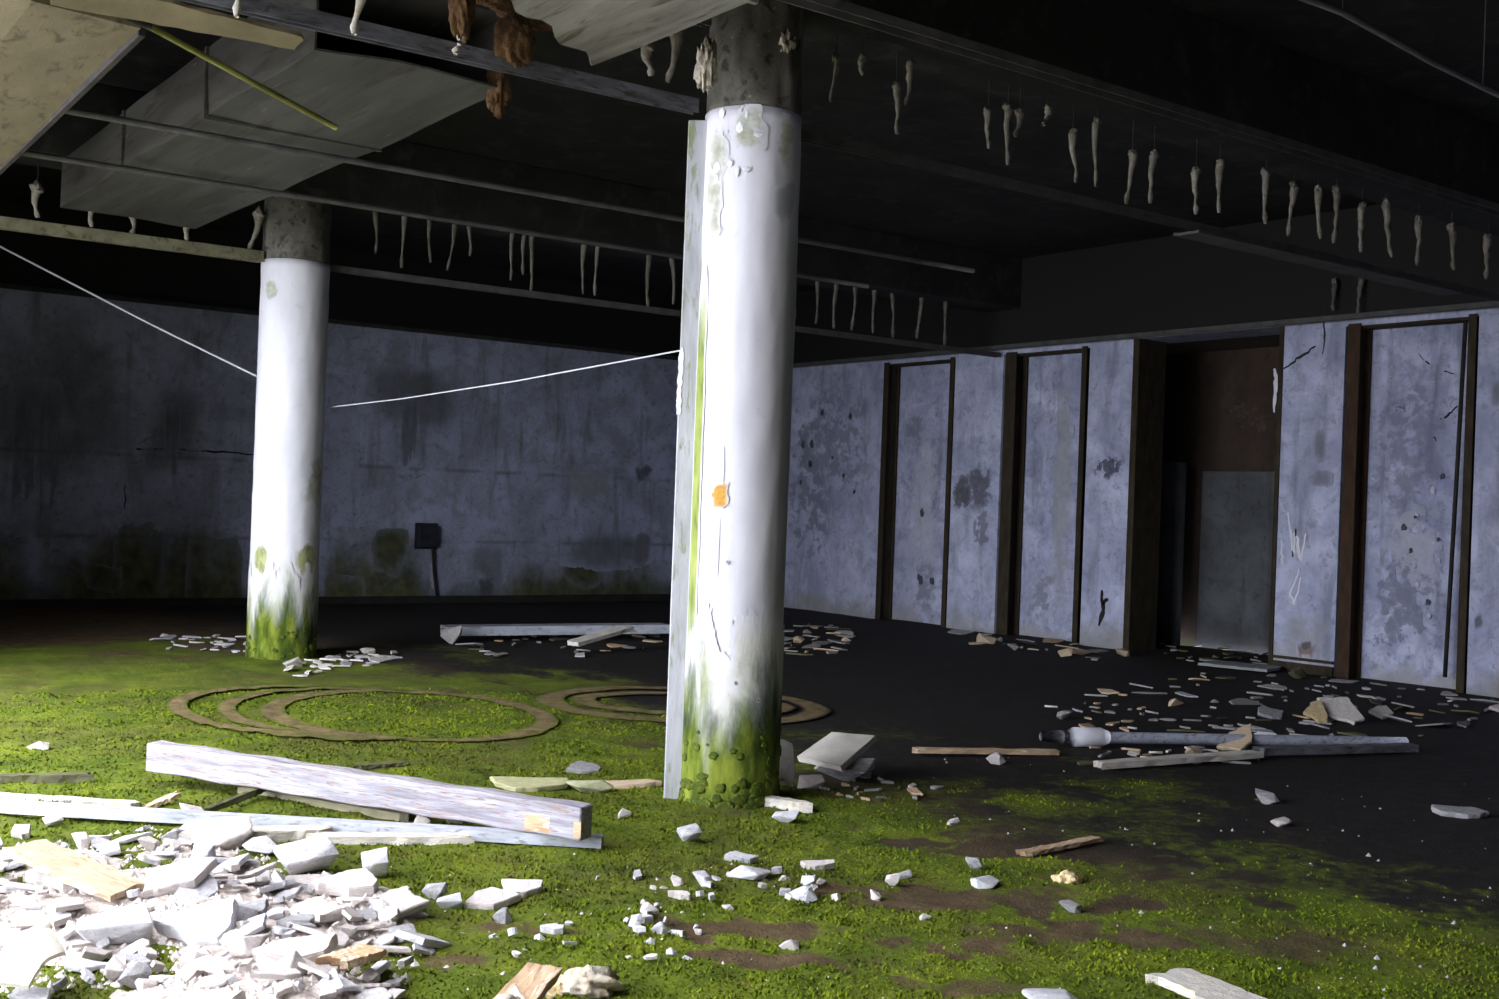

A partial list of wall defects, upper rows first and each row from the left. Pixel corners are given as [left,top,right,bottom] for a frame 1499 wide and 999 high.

peeling [708,104,796,225]
rust [709,445,729,579]